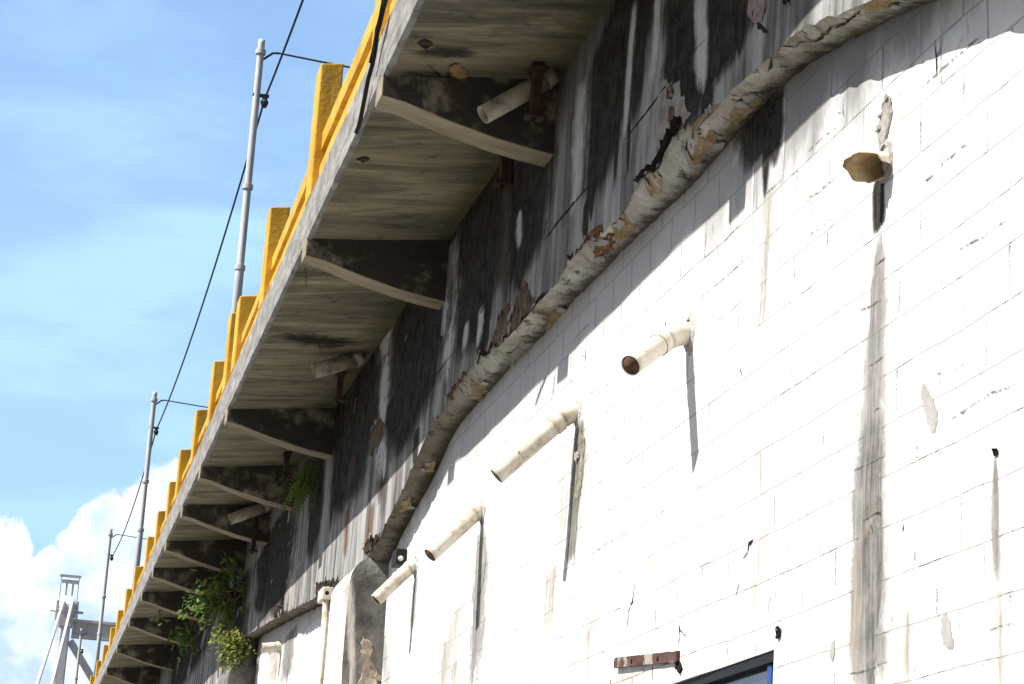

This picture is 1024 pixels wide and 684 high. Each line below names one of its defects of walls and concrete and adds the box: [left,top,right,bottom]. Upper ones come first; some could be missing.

damp [419,48,473,57]
damp [570,0,754,238]
crack [625,41,704,139]
peeling [632,79,725,196]
peeling [747,0,766,23]
spalling [864,0,901,14]
spalling [875,93,892,149]
spalling [566,212,637,264]
spalling [444,281,548,403]
damp [850,171,887,684]
damp [560,421,586,562]
damp [991,461,1000,577]